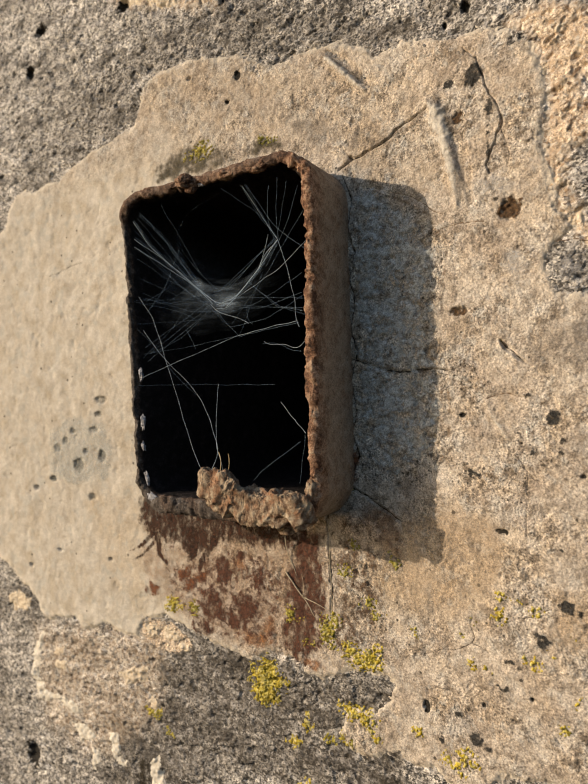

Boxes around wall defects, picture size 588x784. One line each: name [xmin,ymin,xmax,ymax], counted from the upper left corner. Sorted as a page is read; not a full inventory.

crack [340,108,460,380]
rust [136,498,398,670]